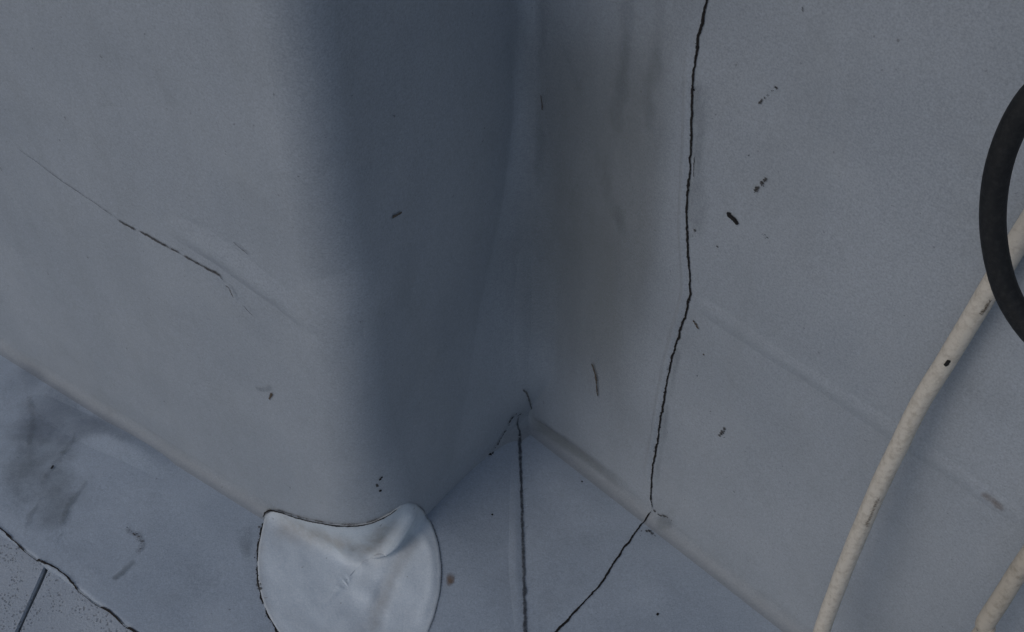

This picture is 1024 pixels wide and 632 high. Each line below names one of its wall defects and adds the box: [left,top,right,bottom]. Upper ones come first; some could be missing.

crack [28,156,252,315]
crack [555,0,708,632]
crack [508,422,527,632]